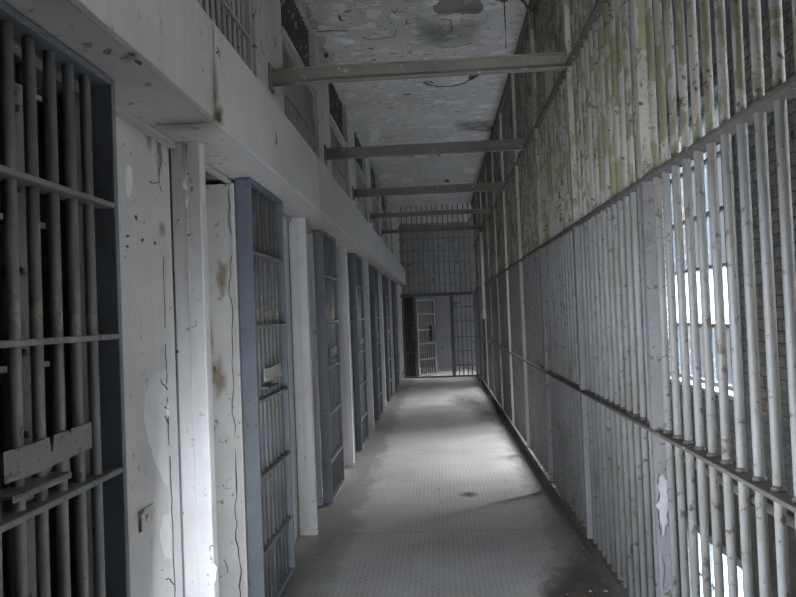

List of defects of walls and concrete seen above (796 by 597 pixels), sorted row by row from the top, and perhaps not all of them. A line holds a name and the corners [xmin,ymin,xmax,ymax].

peeling [423,0,483,15]
rust [213,28,221,122]
peeling [143,370,169,485]
peeling [159,511,173,560]